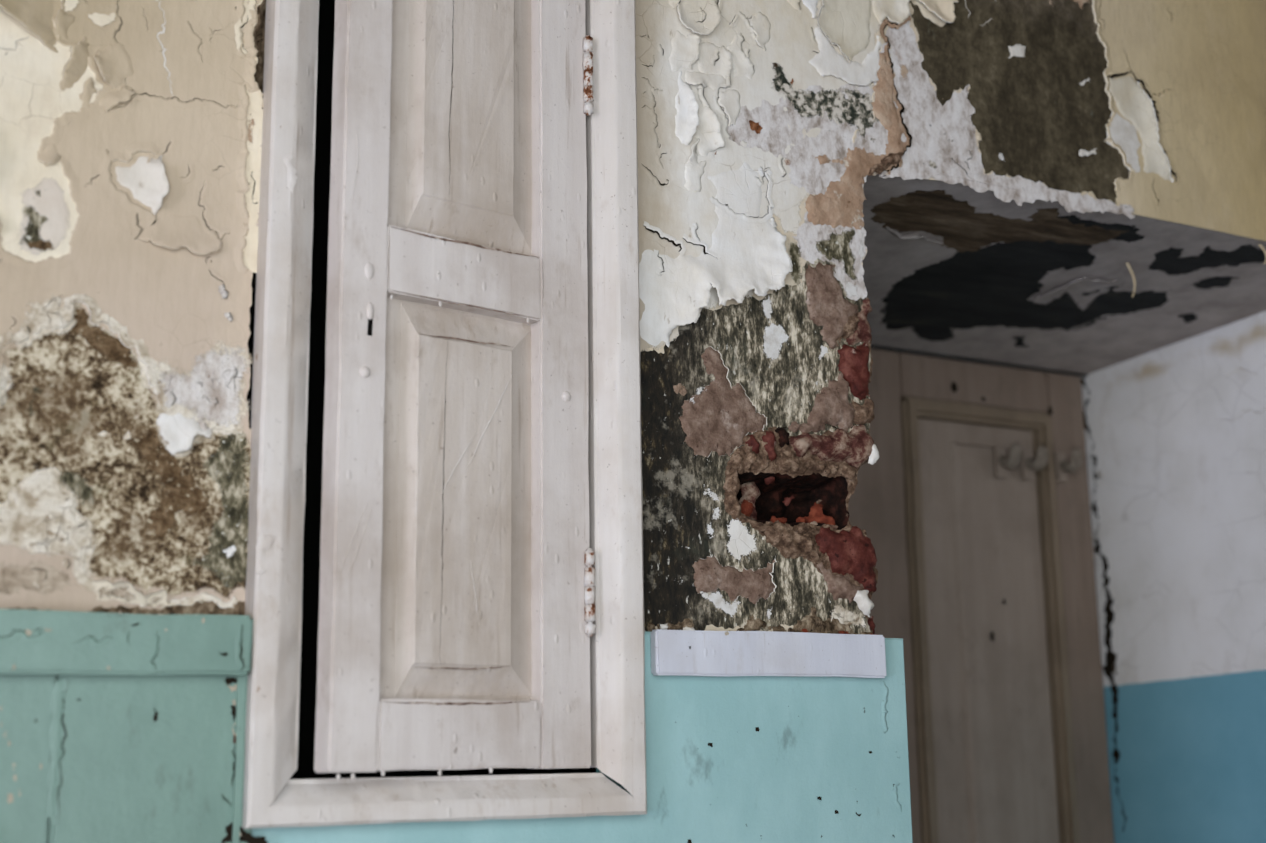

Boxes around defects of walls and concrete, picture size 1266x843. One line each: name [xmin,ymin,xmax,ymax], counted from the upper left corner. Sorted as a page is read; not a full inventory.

peeling [0,0,135,273]
crack [78,0,124,47]
crack [130,211,156,239]
crack [107,78,248,117]
crack [162,139,258,322]
crack [182,0,256,64]
peeling [232,0,266,275]
peeling [635,0,959,352]
peeling [871,153,1266,347]
peeling [1079,76,1174,183]
water stain [0,294,251,608]
spalling [726,426,858,564]